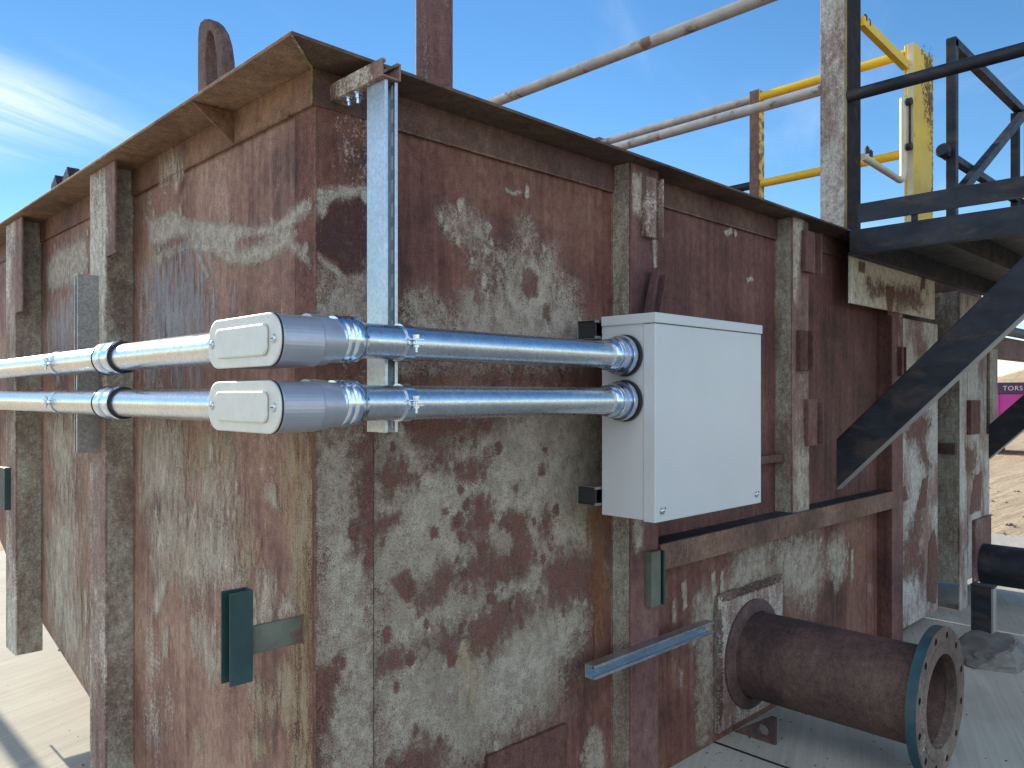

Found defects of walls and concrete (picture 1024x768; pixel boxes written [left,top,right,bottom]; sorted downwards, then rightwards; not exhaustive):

peeling [398,197,584,339]
peeling [632,171,642,221]
rust [859,261,926,315]
rust [244,432,346,768]
rust [348,417,611,693]
peeling [672,529,854,747]
rust [903,410,938,603]
rust [386,725,452,768]